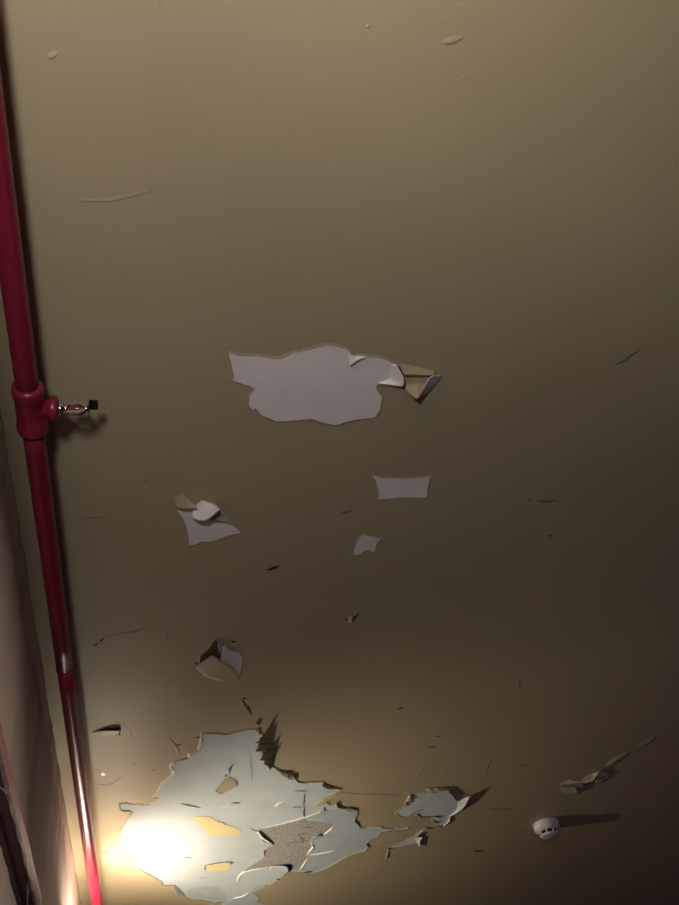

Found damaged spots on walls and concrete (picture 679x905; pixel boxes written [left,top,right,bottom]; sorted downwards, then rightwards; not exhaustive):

peeling [227,342,443,426]
peeling [371,475,432,500]
peeling [173,494,243,546]
peeling [352,533,383,555]
peeling [195,638,243,682]
peeling [93,727,121,738]
peeling [557,770,611,794]
peeling [117,728,473,905]